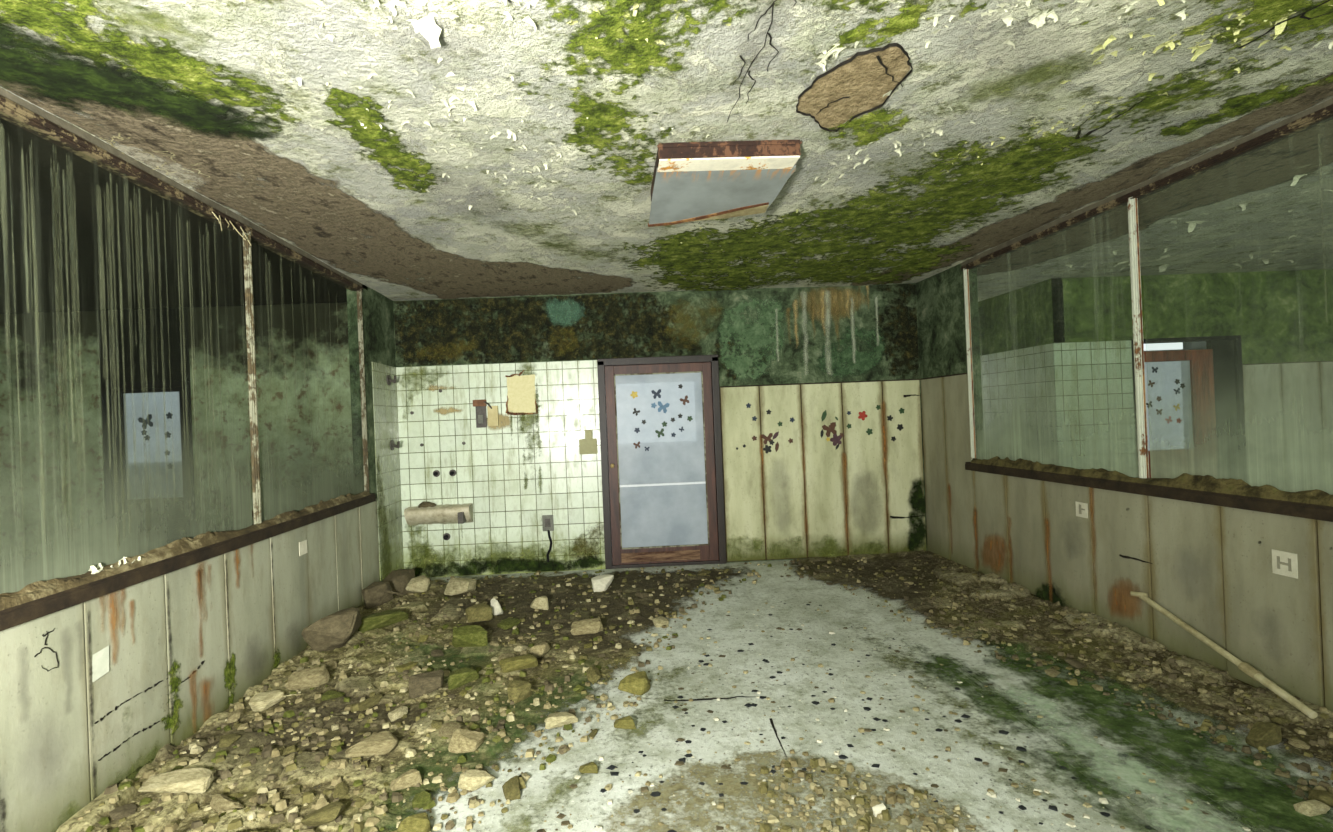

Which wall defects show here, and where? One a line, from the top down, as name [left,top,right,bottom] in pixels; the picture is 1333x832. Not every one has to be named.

peeling [919,0,1099,49]
peeling [317,55,379,89]
peeling [362,0,635,239]
crack [727,0,797,122]
flaking render [796,41,913,132]
damp [99,133,210,187]
corrosion [100,589,134,661]